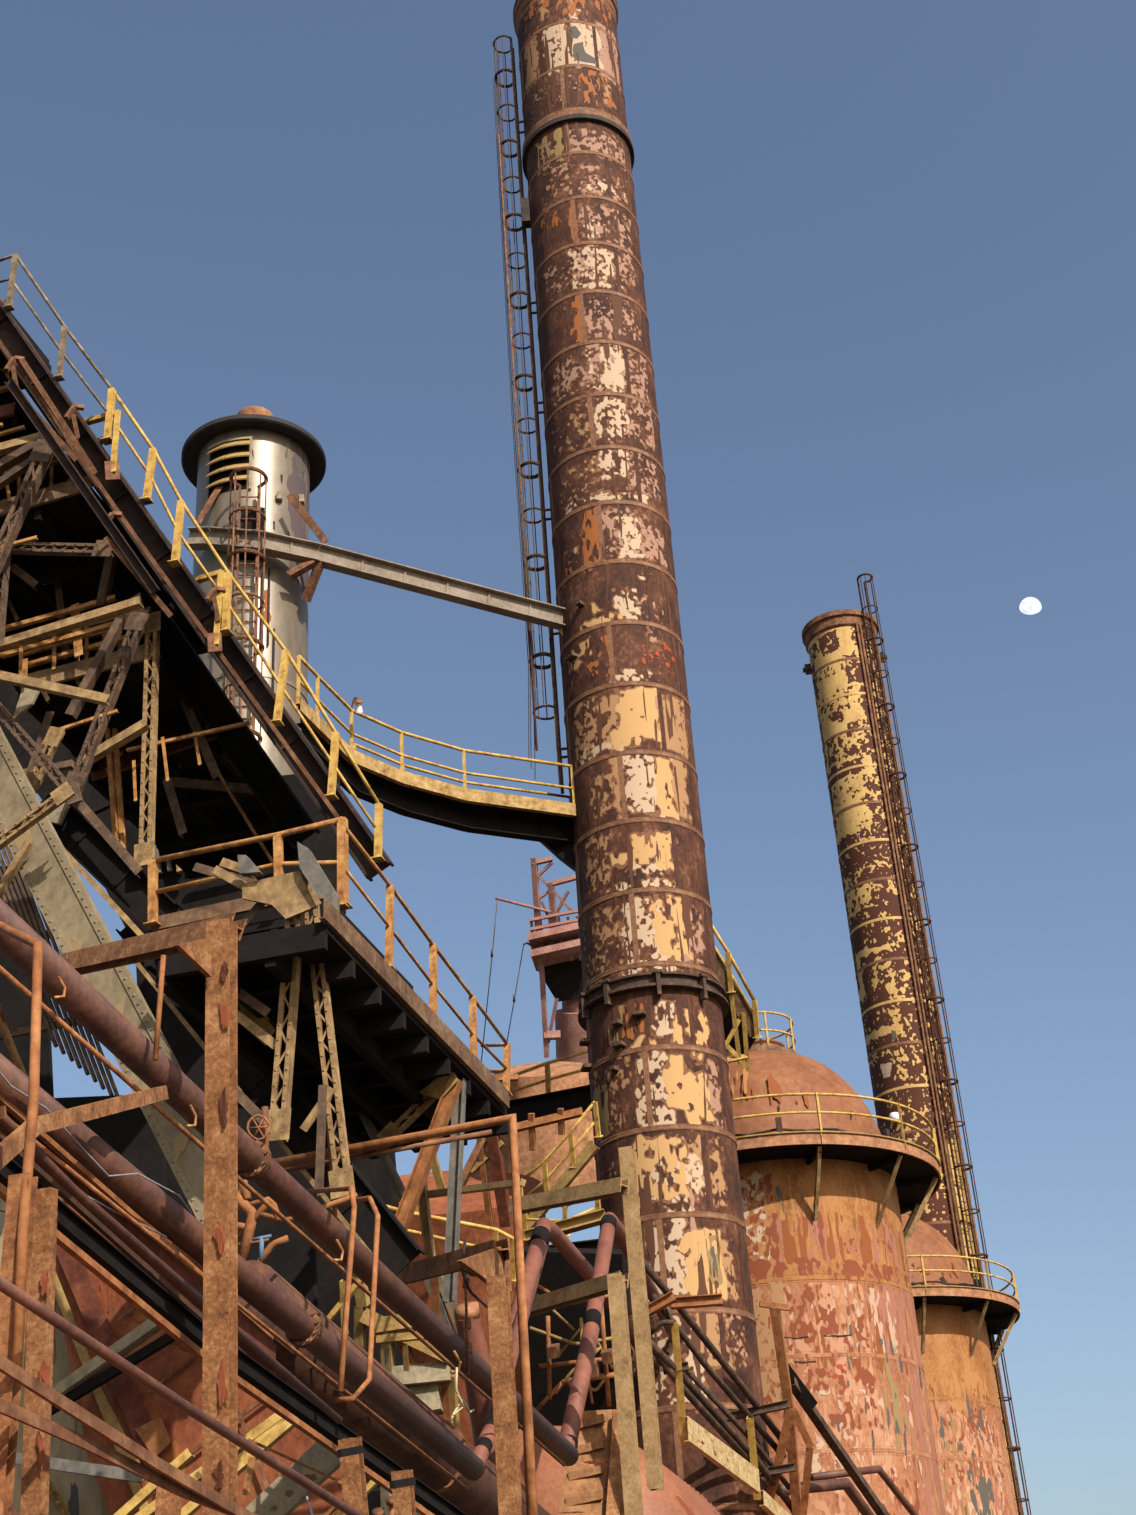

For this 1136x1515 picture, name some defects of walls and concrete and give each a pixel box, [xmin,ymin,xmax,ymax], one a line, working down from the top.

peeling [524,0,621,124]
rust [523,0,655,399]
peeling [539,128,668,675]
rust [561,424,634,591]
rust [567,602,633,964]
rust [641,606,676,807]
rust [653,841,705,1024]
rust [809,626,960,1249]
peeling [880,1062,892,1078]
rust [616,1136,663,1269]
peeling [592,999,749,1414]
rust [697,1181,733,1295]